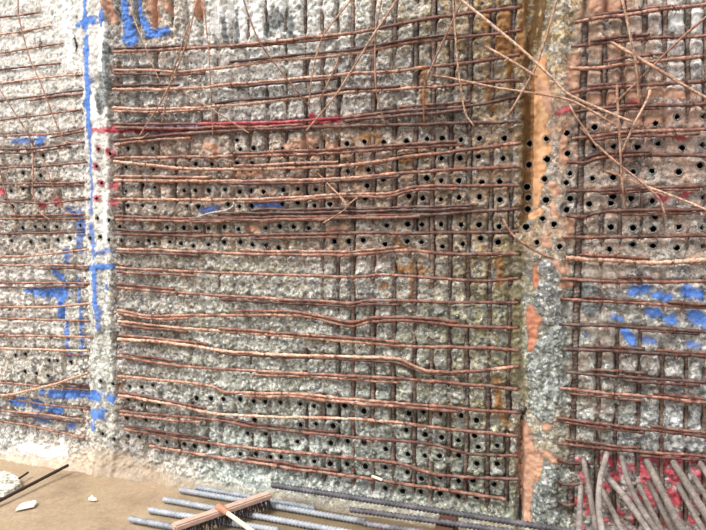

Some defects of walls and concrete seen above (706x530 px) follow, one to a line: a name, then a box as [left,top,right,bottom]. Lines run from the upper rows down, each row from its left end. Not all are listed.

spalling [0,62,83,85]
spalling [0,89,84,102]
corrosion [482,0,551,92]
spalling [0,127,87,157]
corrosion [518,76,535,225]
spalling [558,0,706,251]
spalling [95,0,582,525]
spalling [557,277,706,316]
spalling [559,317,706,347]
spalling [563,347,706,379]
spalling [560,375,706,431]
spalling [557,392,706,502]